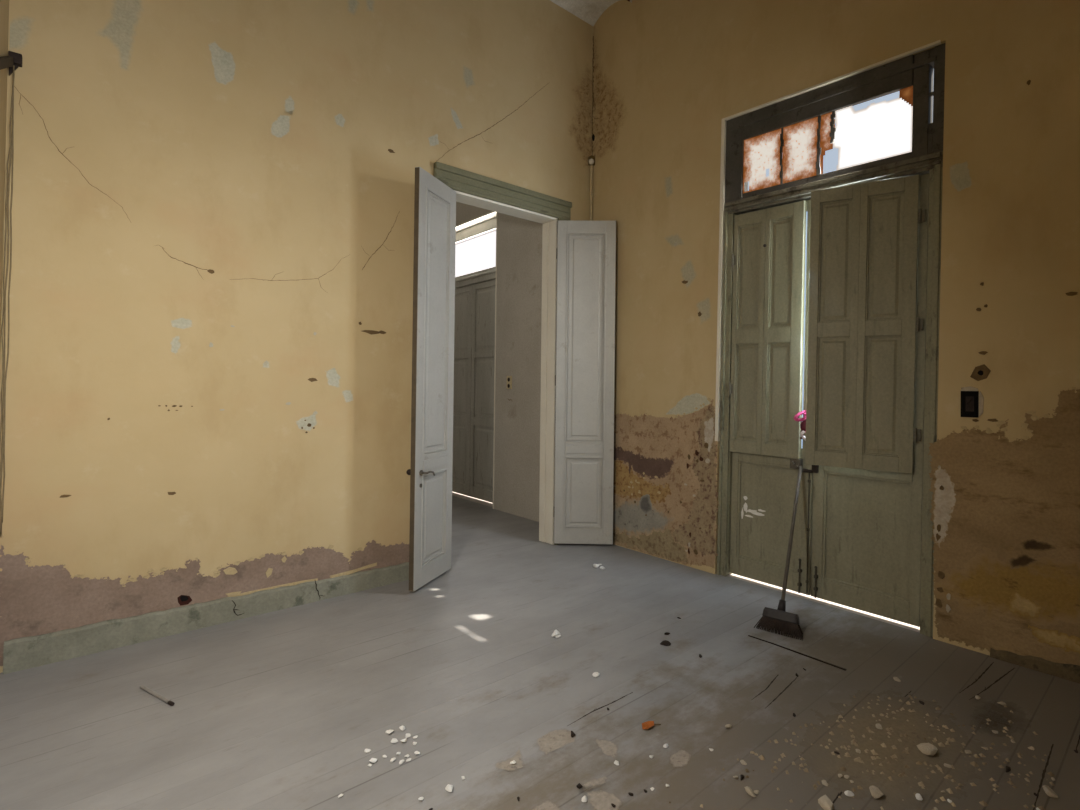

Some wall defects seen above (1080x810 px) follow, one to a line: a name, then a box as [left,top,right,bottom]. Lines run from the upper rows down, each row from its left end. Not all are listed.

peeling [208,41,237,86]
crack [14,86,131,222]
crack [156,213,399,291]
peeling [613,392,719,568]
peeling [927,387,1080,666]
peeling [0,534,409,667]
leakage [933,547,1080,653]